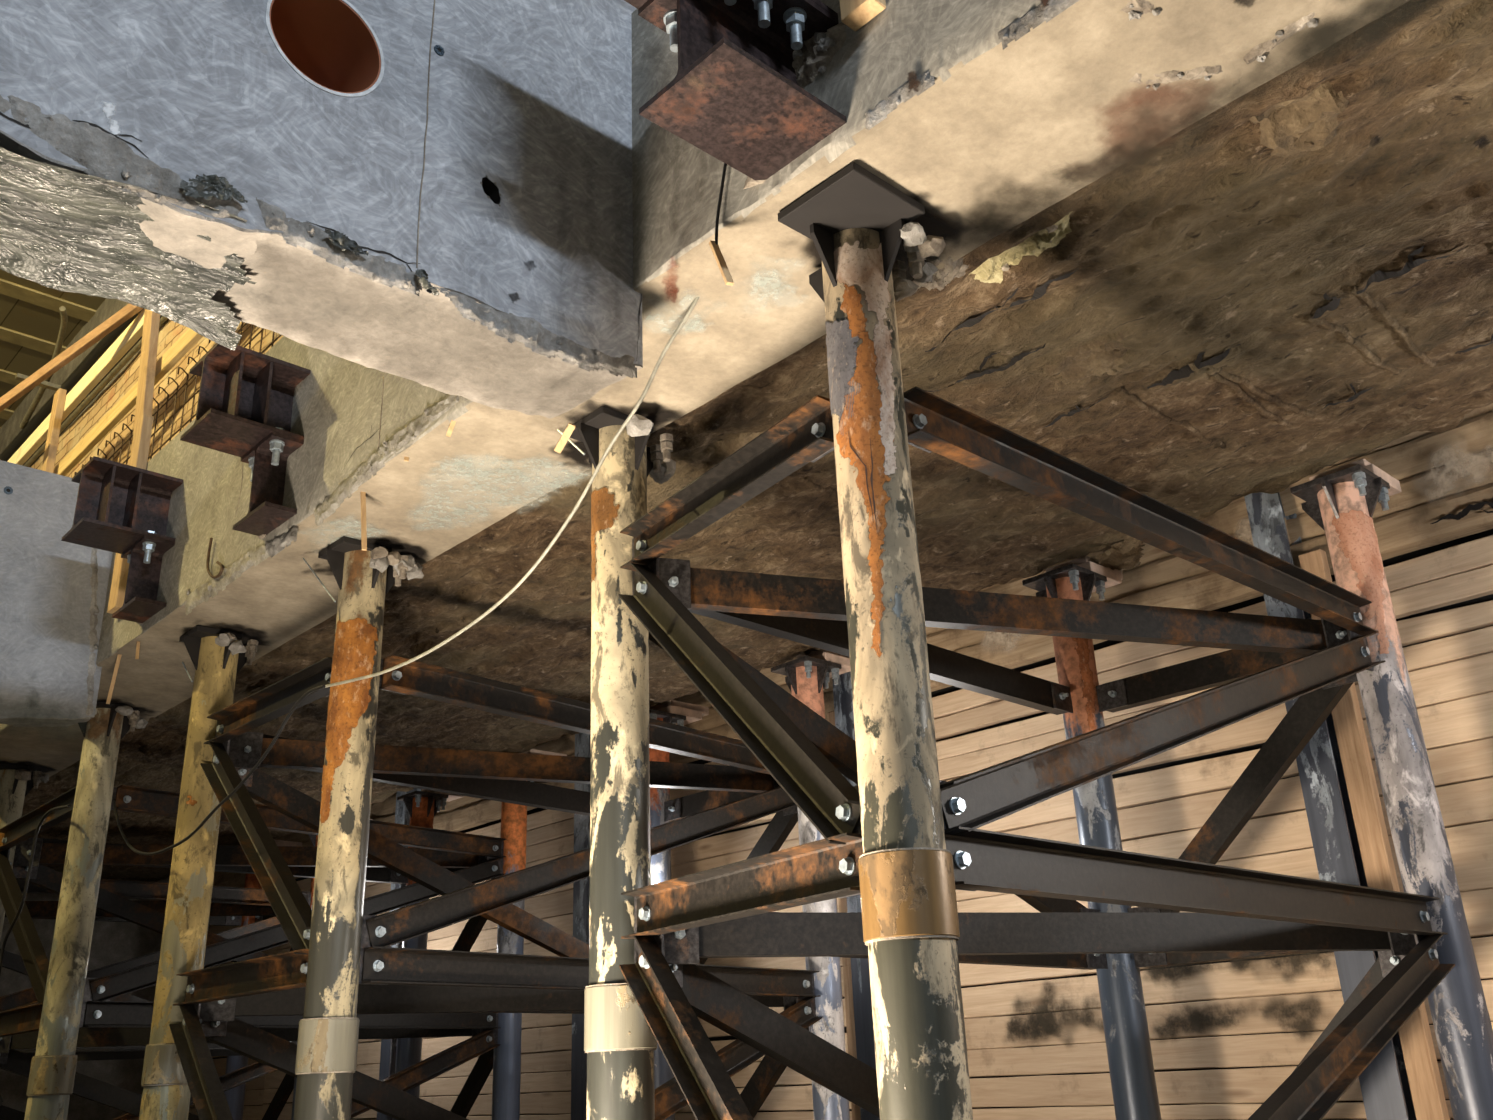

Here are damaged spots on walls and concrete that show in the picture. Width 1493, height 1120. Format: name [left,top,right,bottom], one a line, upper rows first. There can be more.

spalling [998,0,1079,50]
spalling [1243,12,1318,64]
damp [103,102,120,136]
spalling [865,70,935,130]
spalling [1249,82,1349,158]
spalling [0,95,637,378]
spalling [895,195,966,283]
corrosion [836,284,895,657]
corrosion [591,487,620,582]
corrosion [1332,510,1390,654]
corrosion [320,618,378,824]
corrosion [1072,638,1096,731]